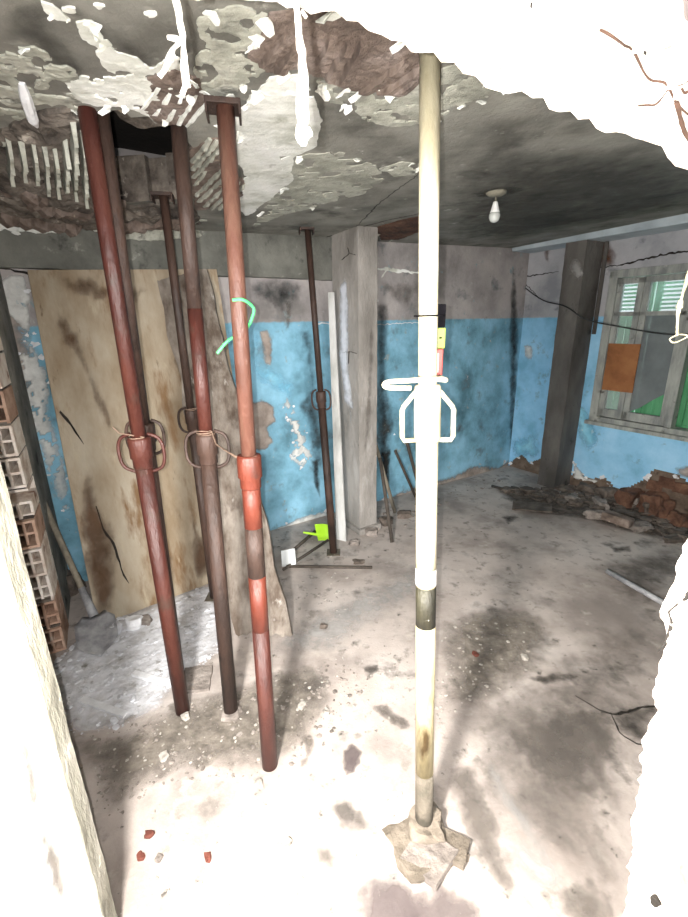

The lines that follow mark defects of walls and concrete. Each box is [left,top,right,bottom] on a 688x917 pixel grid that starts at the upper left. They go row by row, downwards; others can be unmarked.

peeling [0,0,180,127]
spalling [168,5,419,227]
peeling [440,64,505,122]
leakage [265,284,294,303]
peeling [260,331,290,389]
peeling [3,276,68,512]
peeling [253,401,311,470]
flaking render [570,461,619,490]
flaking render [631,467,688,515]
crack [575,695,656,745]
leakage [363,880,477,917]
leakage [569,896,598,917]